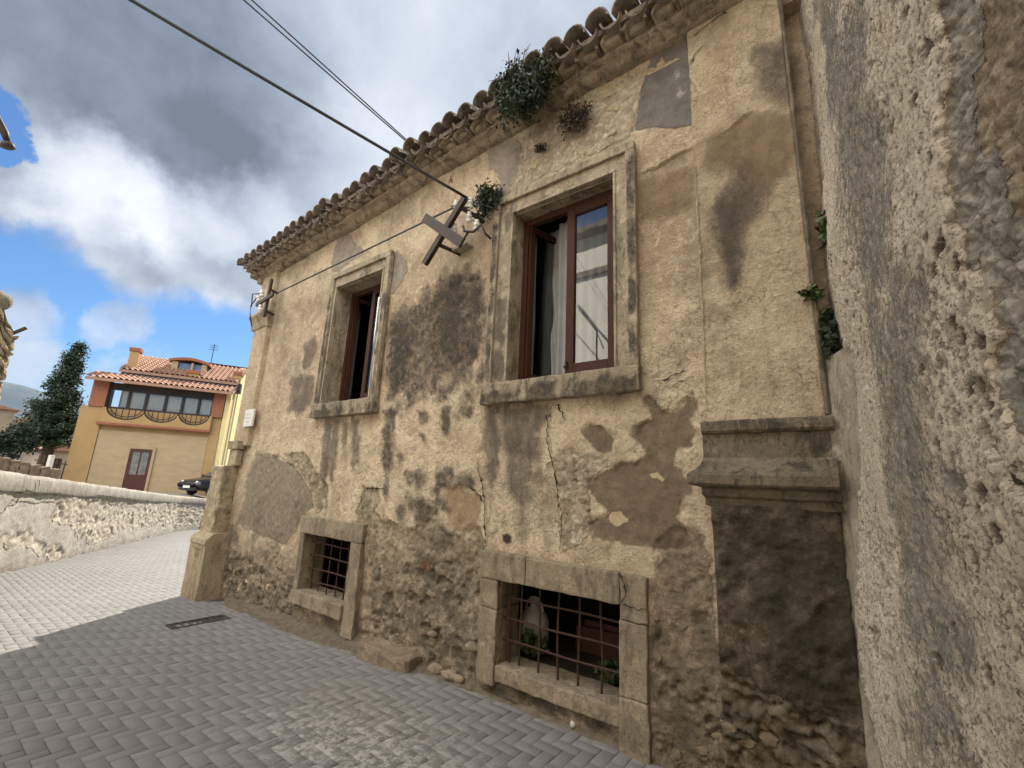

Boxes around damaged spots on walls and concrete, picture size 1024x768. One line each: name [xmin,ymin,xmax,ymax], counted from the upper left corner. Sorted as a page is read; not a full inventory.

water stain [703,112,795,284]
water stain [290,254,637,521]
spalling [356,483,484,686]
crack [545,404,566,550]
spalling [557,449,623,551]
peeling [609,511,628,526]